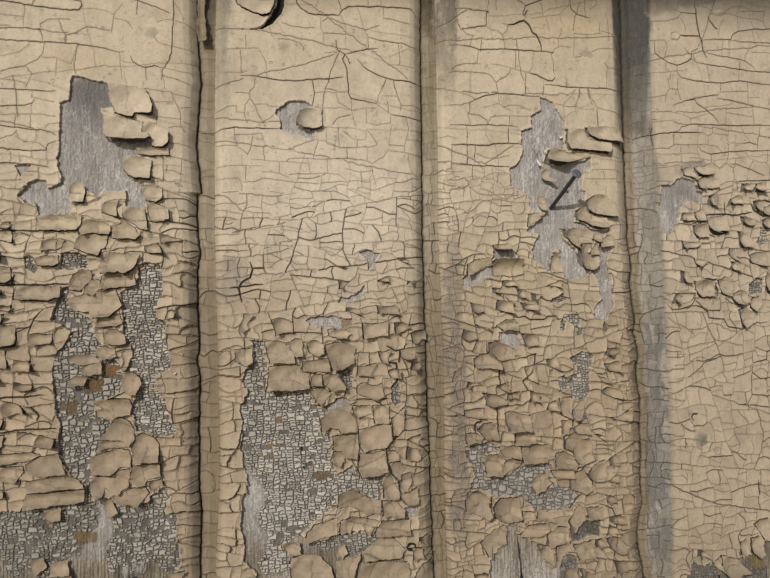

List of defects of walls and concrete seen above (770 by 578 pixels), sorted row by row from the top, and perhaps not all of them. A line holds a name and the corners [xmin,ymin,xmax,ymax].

crack [0,395,55,434]
crack [1,278,66,301]
peeling [0,77,185,578]
crack [195,41,209,578]
crack [233,263,263,300]
peeling [235,280,433,578]
crack [261,0,434,576]
peeling [464,347,629,578]
peeling [493,98,624,330]
crack [450,0,770,578]
peeling [658,163,770,328]
peeling [687,517,770,578]